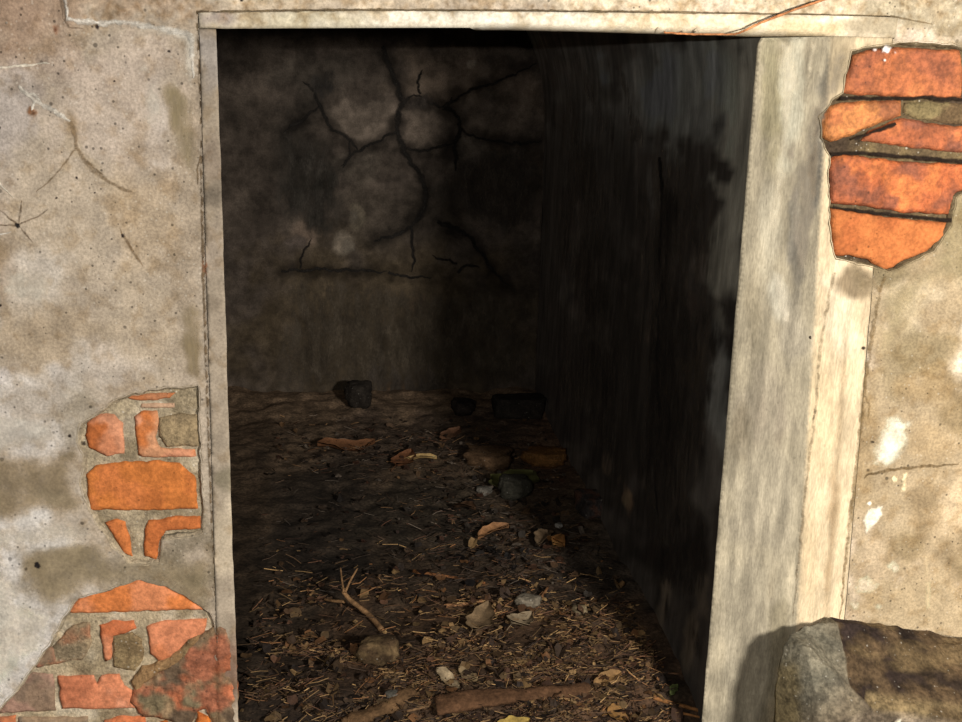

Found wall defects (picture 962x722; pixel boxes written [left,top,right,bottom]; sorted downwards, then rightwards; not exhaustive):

crack [0,62,129,236]
spalling [818,40,962,272]
crack [196,8,931,596]
damp [0,454,76,517]
spalling [76,384,205,566]
spalling [0,578,239,722]